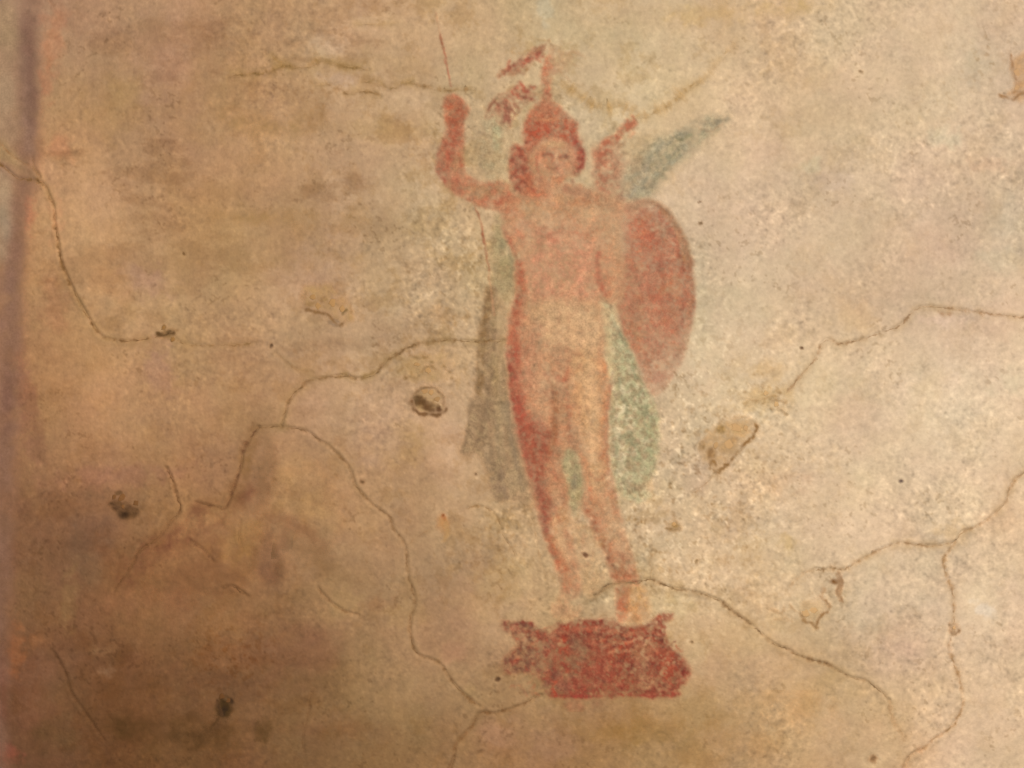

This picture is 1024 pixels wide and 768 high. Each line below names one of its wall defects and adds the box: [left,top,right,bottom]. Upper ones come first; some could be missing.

crack [0,150,158,342]
spalling [109,491,139,521]
crack [208,339,502,507]
spalling [409,386,448,418]
spalling [699,420,759,473]
crack [787,306,1024,391]
crack [357,487,528,765]
crack [594,579,893,719]
crack [904,524,981,757]